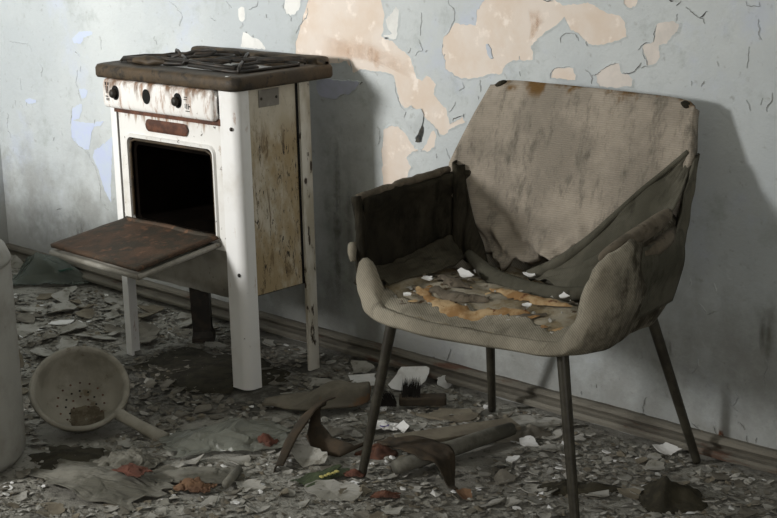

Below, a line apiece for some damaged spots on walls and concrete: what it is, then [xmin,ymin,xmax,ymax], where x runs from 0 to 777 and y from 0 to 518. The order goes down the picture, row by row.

peeling [237,6,266,51]
peeling [283,0,467,185]
peeling [441,0,639,83]
crack [550,26,657,84]
peeling [595,60,635,90]
crack [669,0,708,24]
crack [746,1,762,68]
crack [746,93,773,112]
peeling [71,88,113,203]